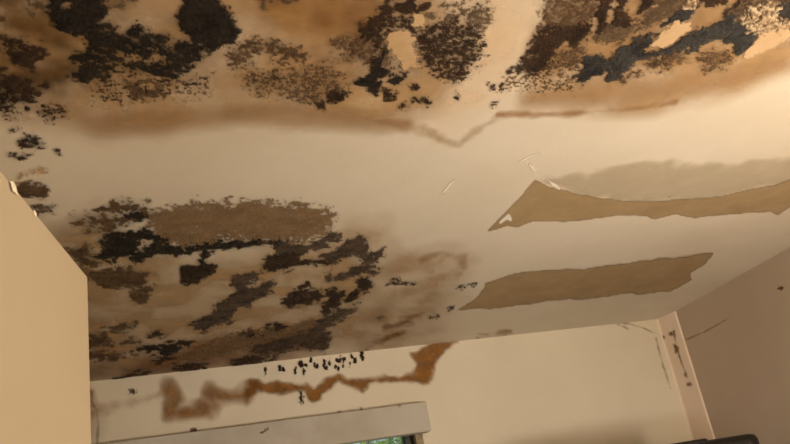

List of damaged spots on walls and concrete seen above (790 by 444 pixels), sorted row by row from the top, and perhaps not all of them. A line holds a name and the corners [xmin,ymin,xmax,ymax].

damp [0,0,494,126]
damp [486,0,790,112]
damp [8,128,46,161]
damp [16,180,56,216]
damp [59,195,386,380]